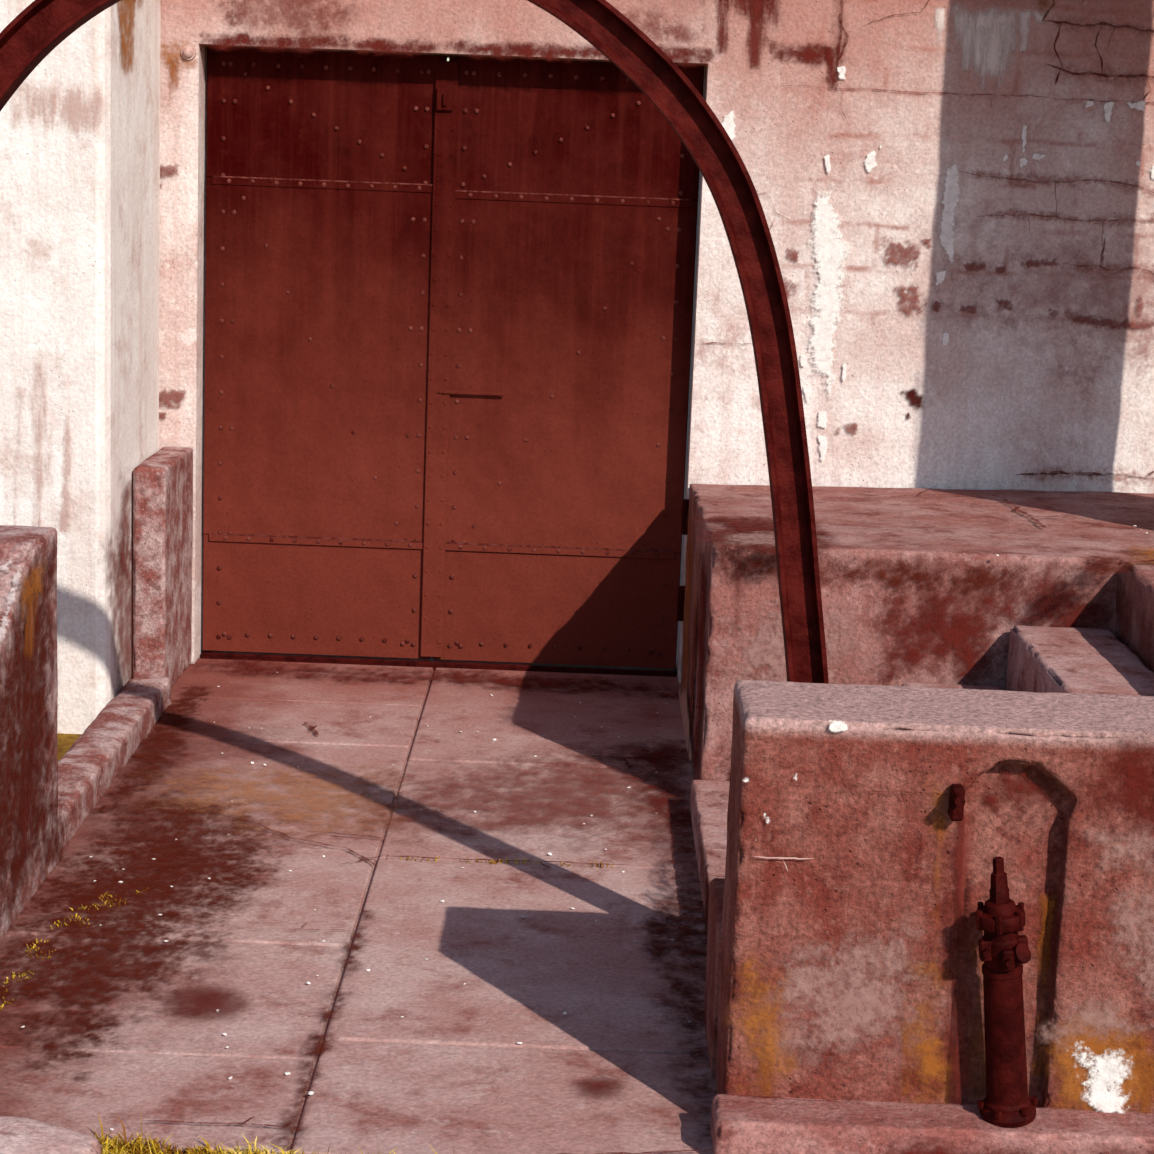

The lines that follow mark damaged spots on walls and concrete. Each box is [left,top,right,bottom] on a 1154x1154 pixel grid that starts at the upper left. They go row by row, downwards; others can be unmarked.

leakage [659,0,842,89]
crack [787,0,1154,118]
peeling [721,110,736,140]
peeling [864,145,882,172]
peeling [884,164,1006,287]
peeling [800,155,852,396]
spalling [1023,260,1058,268]
spalling [895,285,941,316]
spalling [1049,296,1154,329]
spalling [902,389,924,419]
peeling [818,411,858,461]